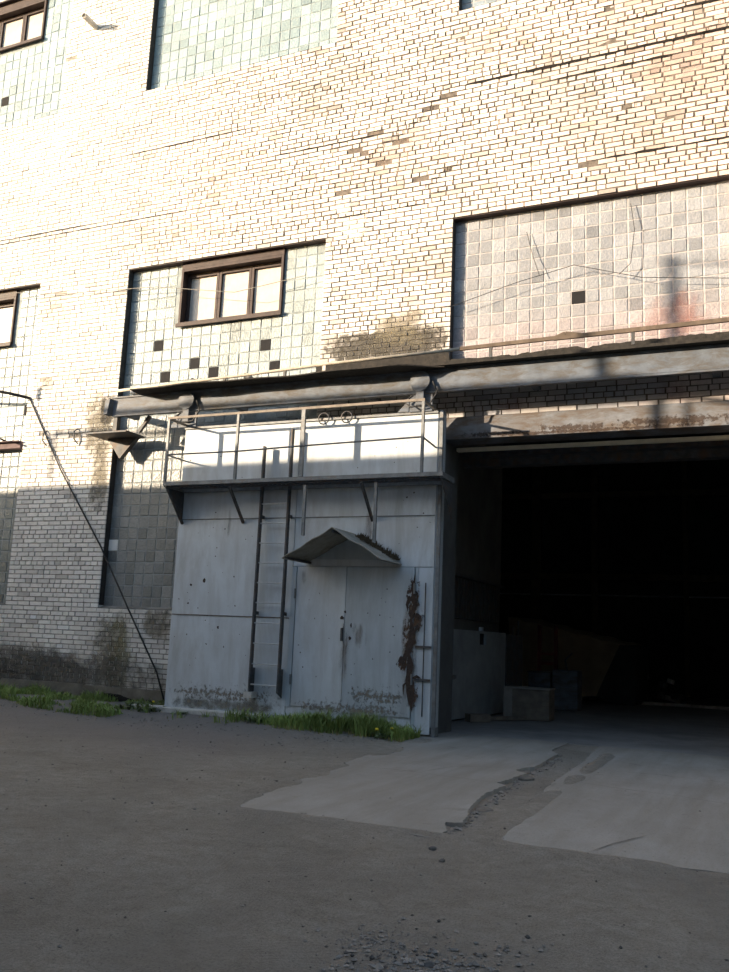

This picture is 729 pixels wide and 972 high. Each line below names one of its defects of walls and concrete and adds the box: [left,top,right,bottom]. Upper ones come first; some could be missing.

leakage [325,311,448,361]
corrosion [396,576,423,712]